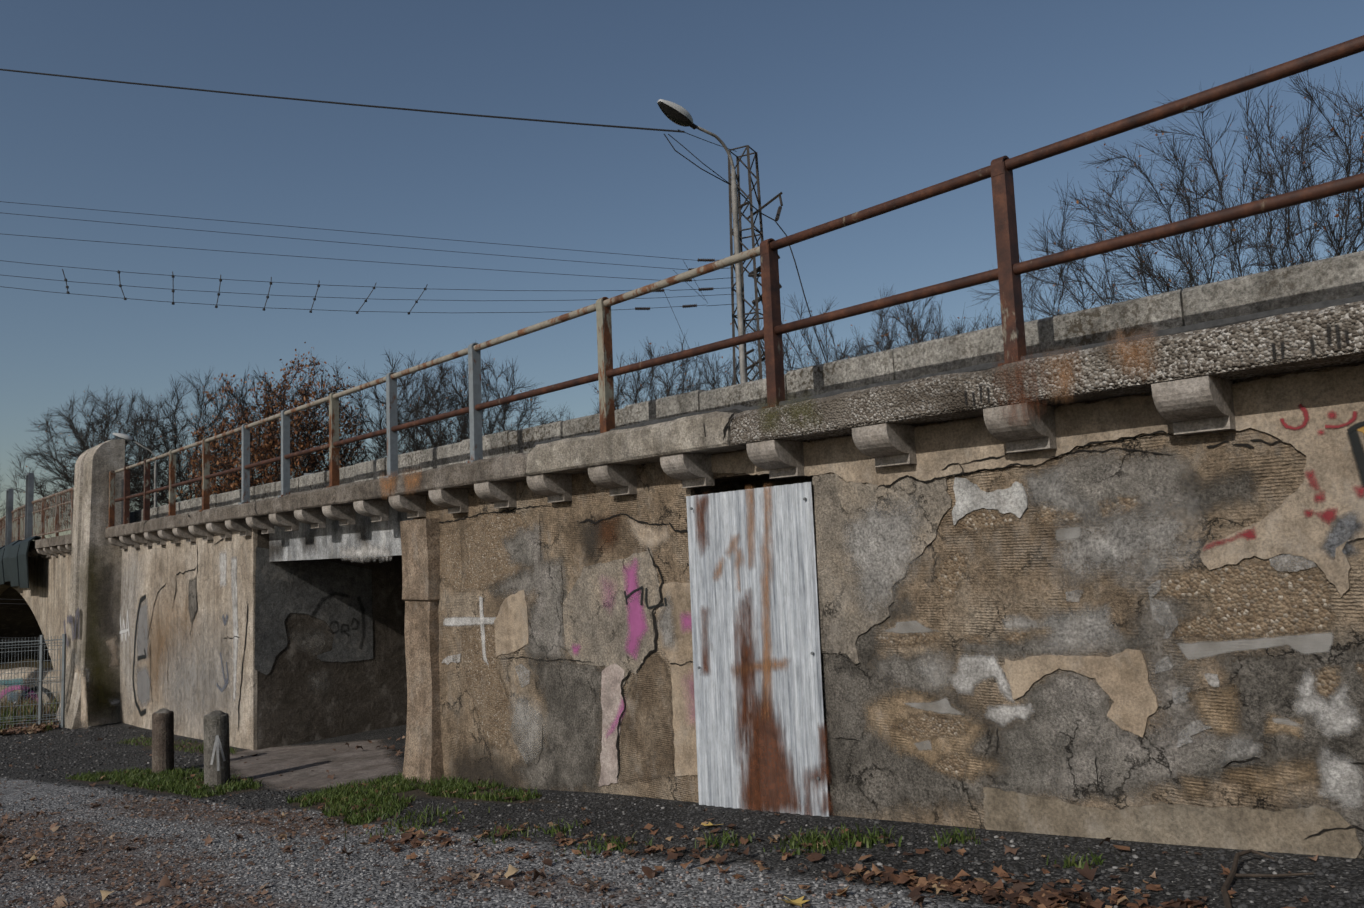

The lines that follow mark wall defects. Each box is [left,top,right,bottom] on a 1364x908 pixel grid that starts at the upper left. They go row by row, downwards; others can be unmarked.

spalling [440,511,533,750]
crack [439,505,564,619]
crack [500,656,592,690]
flaking render [562,519,698,786]
crack [580,513,693,777]
corrosion [696,497,708,545]
corrosion [717,489,831,815]
flaking render [952,477,1083,532]
crack [878,430,1174,488]
spalling [1149,555,1335,639]
crack [1207,439,1281,448]
spalling [867,690,995,781]